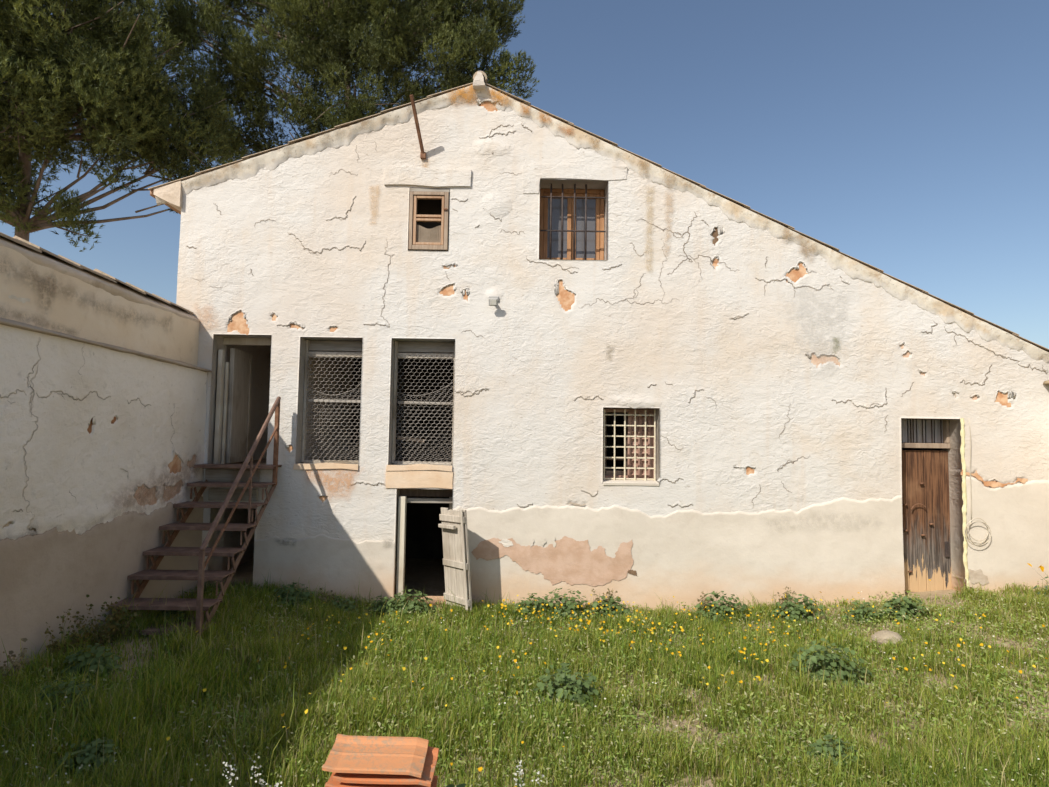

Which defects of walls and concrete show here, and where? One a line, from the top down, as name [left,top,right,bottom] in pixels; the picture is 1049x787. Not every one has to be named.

crack [254,142,391,328]
crack [450,197,850,320]
peeling [786,260,809,282]
peeling [440,282,471,300]
peeling [554,278,576,311]
peeling [227,308,249,335]
peeling [804,351,840,368]
peeling [994,389,1017,407]
crack [0,338,175,528]
peeling [133,448,198,506]
peeling [961,470,1028,488]
peeling [471,536,637,587]